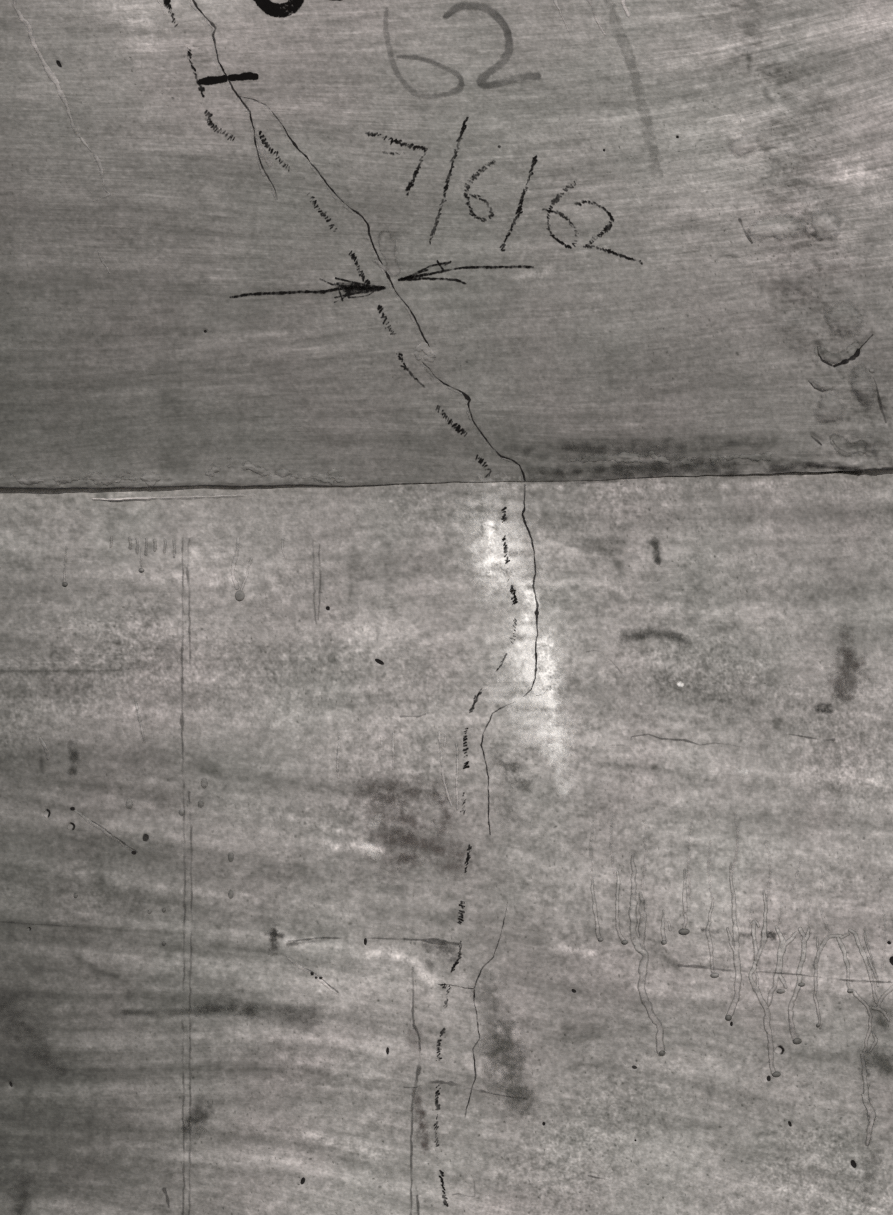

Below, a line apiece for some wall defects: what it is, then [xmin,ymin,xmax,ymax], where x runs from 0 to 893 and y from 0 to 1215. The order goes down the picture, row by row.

crack [191,0,539,835]
water stain [473,520,564,758]
crack [70,807,136,854]
crack [287,957,338,995]
water stain [610,815,719,1056]
water stain [725,813,893,1146]